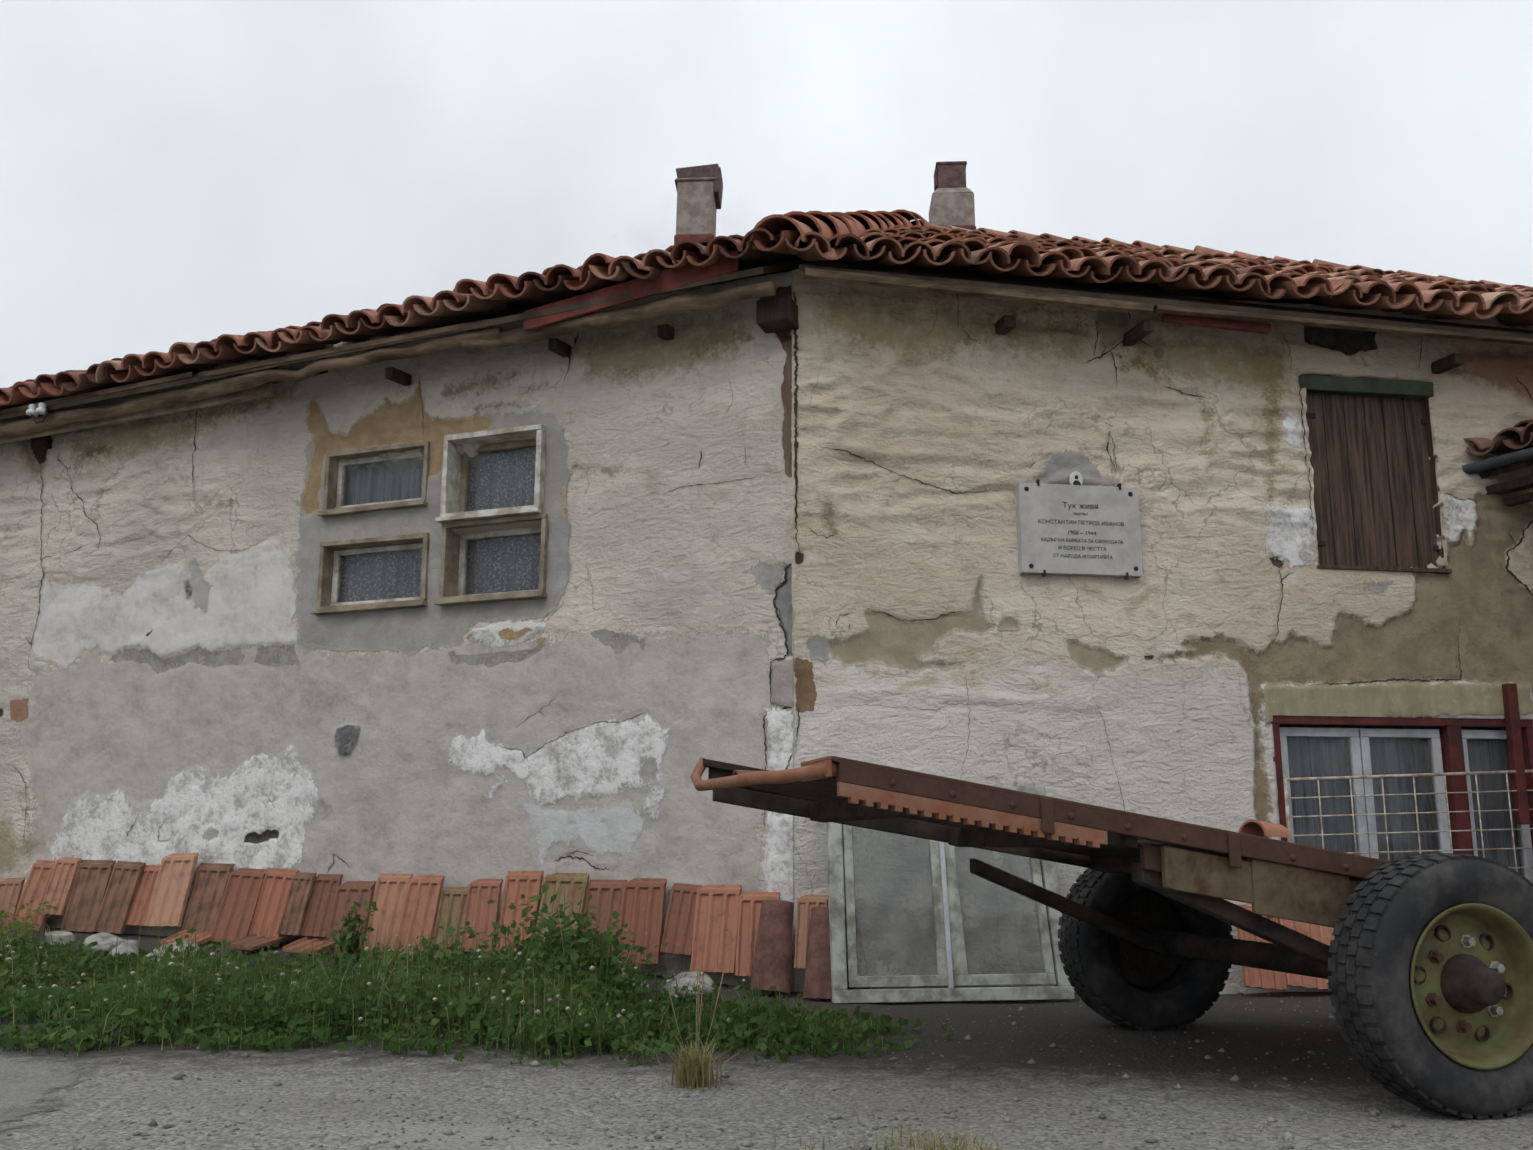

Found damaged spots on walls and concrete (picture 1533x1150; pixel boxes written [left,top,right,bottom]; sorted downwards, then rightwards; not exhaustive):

crack [25,430,101,675]
spalling [300,382,492,516]
peeling [0,552,1035,952]
crack [667,292,1125,811]
spalling [1067,489,1533,838]